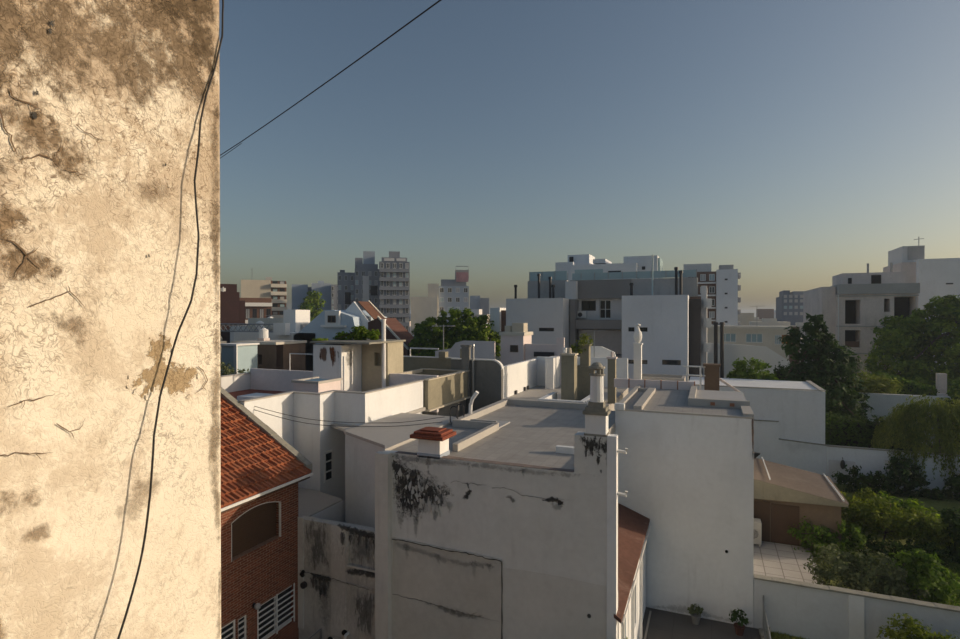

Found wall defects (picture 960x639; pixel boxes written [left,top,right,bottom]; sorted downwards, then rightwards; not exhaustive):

water stain [0,0,214,180]
water stain [211,204,220,282]
water stain [209,372,221,506]
water stain [580,436,607,473]
water stain [337,523,375,549]
water stain [310,573,331,596]
water stain [347,569,375,578]